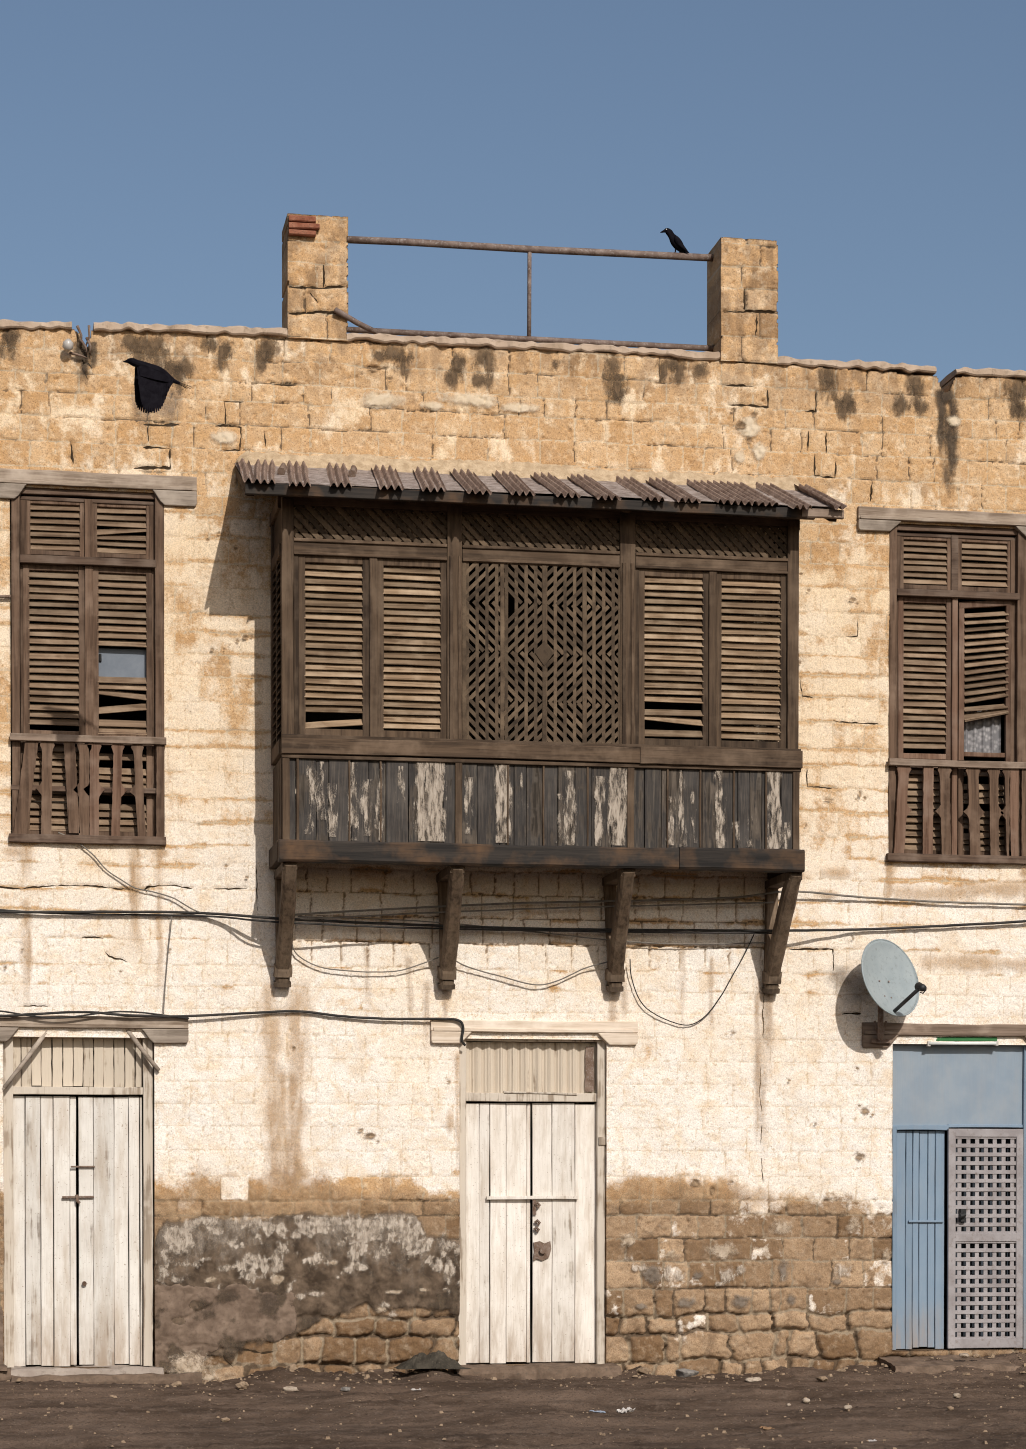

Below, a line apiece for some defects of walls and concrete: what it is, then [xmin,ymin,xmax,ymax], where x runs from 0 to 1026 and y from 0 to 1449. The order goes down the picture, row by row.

leakage [0,328,20,359]
leakage [75,341,96,376]
leakage [123,333,193,394]
leakage [201,337,232,371]
leakage [256,338,280,372]
leakage [444,347,494,388]
leakage [602,356,626,404]
leakage [657,358,707,384]
leakage [819,368,856,420]
leakage [1004,379,1026,418]
leakage [893,376,957,483]
peeling [623,1234,750,1307]